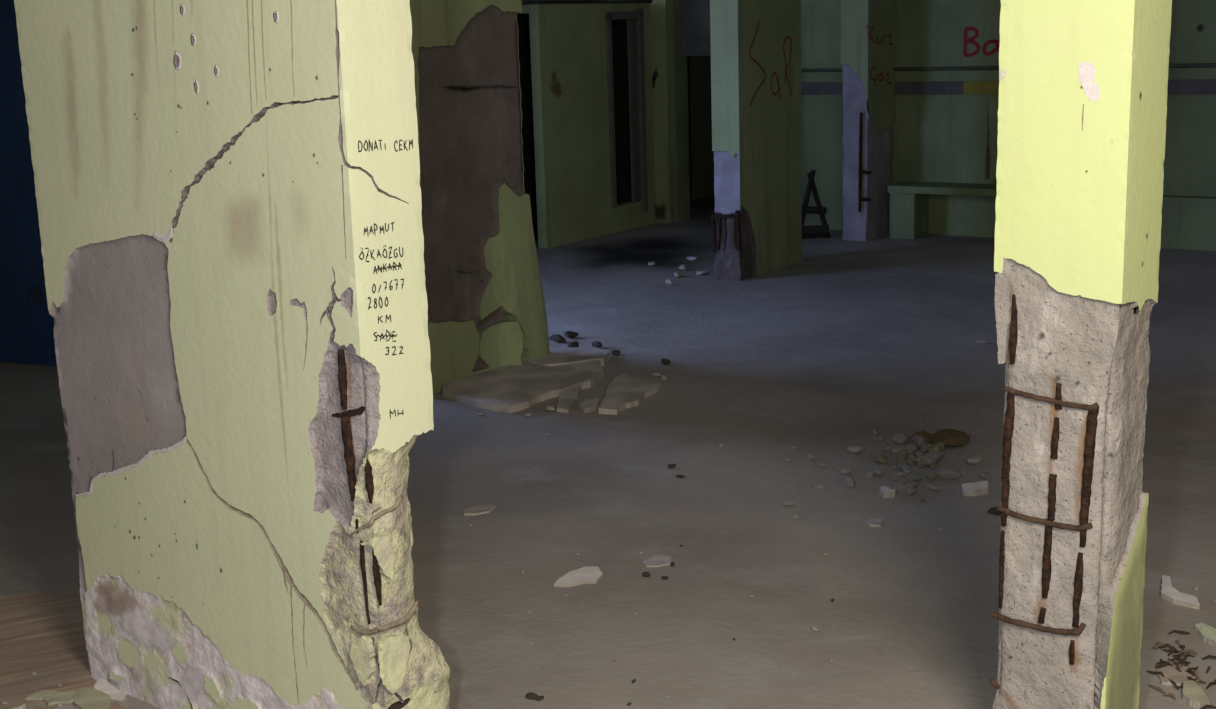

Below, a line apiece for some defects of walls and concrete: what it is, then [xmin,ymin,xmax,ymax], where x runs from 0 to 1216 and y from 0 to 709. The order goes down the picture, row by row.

spalling [992,257,1157,709]